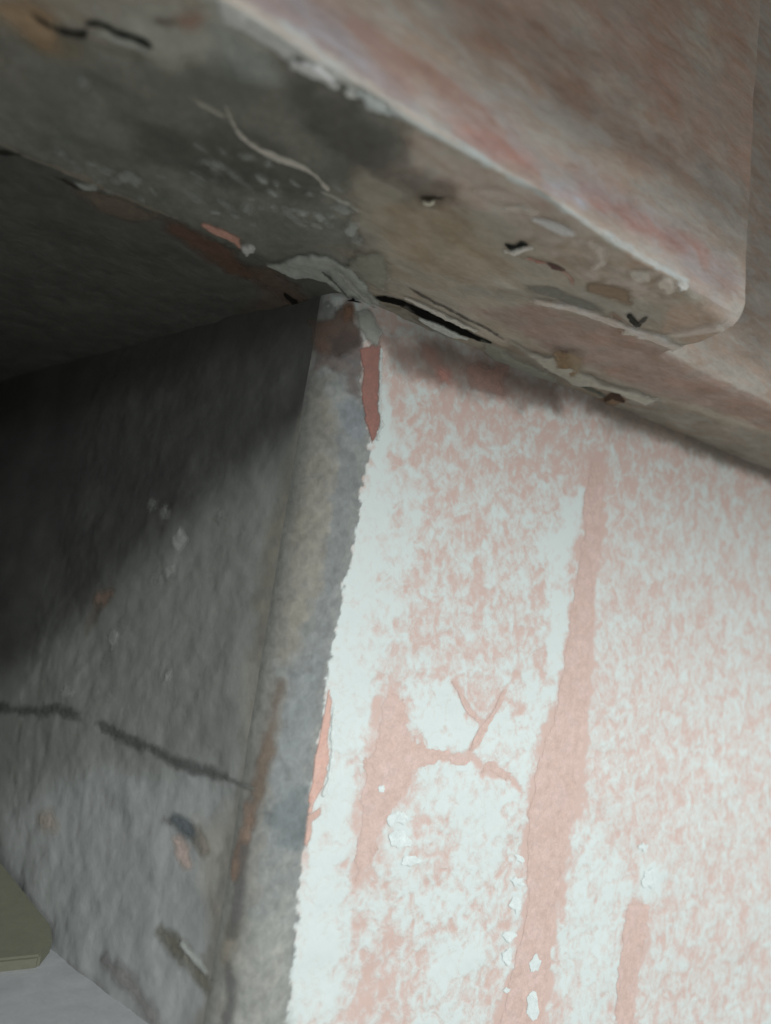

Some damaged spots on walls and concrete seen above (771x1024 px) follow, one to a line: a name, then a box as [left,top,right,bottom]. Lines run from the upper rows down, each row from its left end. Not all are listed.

crack [32,13,152,54]
damp [0,1,450,267]
spalling [504,241,532,256]
peeling [505,206,574,236]
crack [322,272,499,344]
spalling [623,314,648,336]
peeling [360,342,384,441]
crack [0,703,252,789]
peeling [305,691,335,846]
peeling [354,681,511,884]
peeling [500,462,604,1024]
peeling [615,903,650,1024]